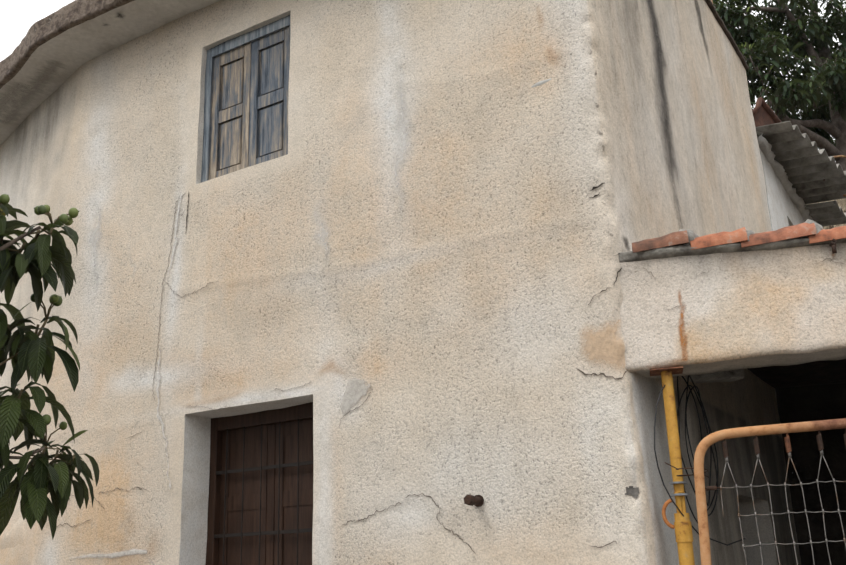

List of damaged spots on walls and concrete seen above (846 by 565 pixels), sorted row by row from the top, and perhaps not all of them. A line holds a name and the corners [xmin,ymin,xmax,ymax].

leakage [647,0,673,164]
crack [152,193,219,399]
flaking render [586,324,625,365]
corrosion [679,295,687,360]
crack [57,487,146,527]
crack [342,493,475,553]